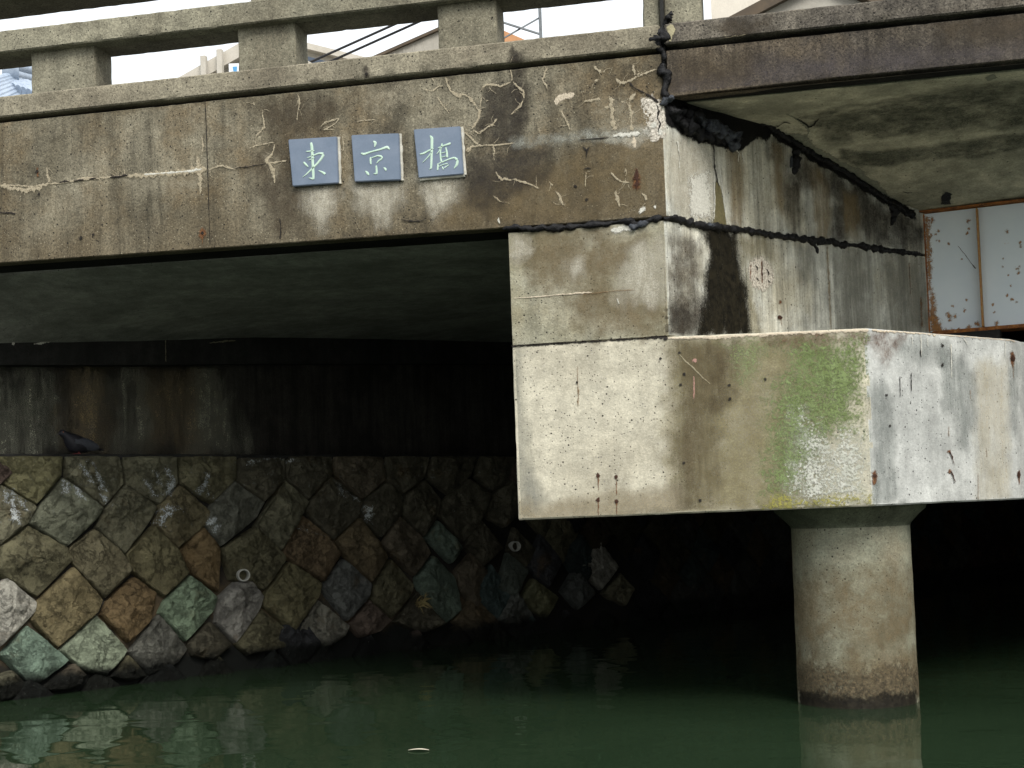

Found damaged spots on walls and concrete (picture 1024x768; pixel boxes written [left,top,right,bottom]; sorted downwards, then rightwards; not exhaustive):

crack [0,165,128,214]
crack [205,102,290,243]
crack [425,57,647,208]
crack [592,62,658,104]
spalling [641,95,666,142]
crack [713,144,726,225]
corrosion [925,217,979,331]
damp [512,140,896,518]
damp [798,658,919,709]